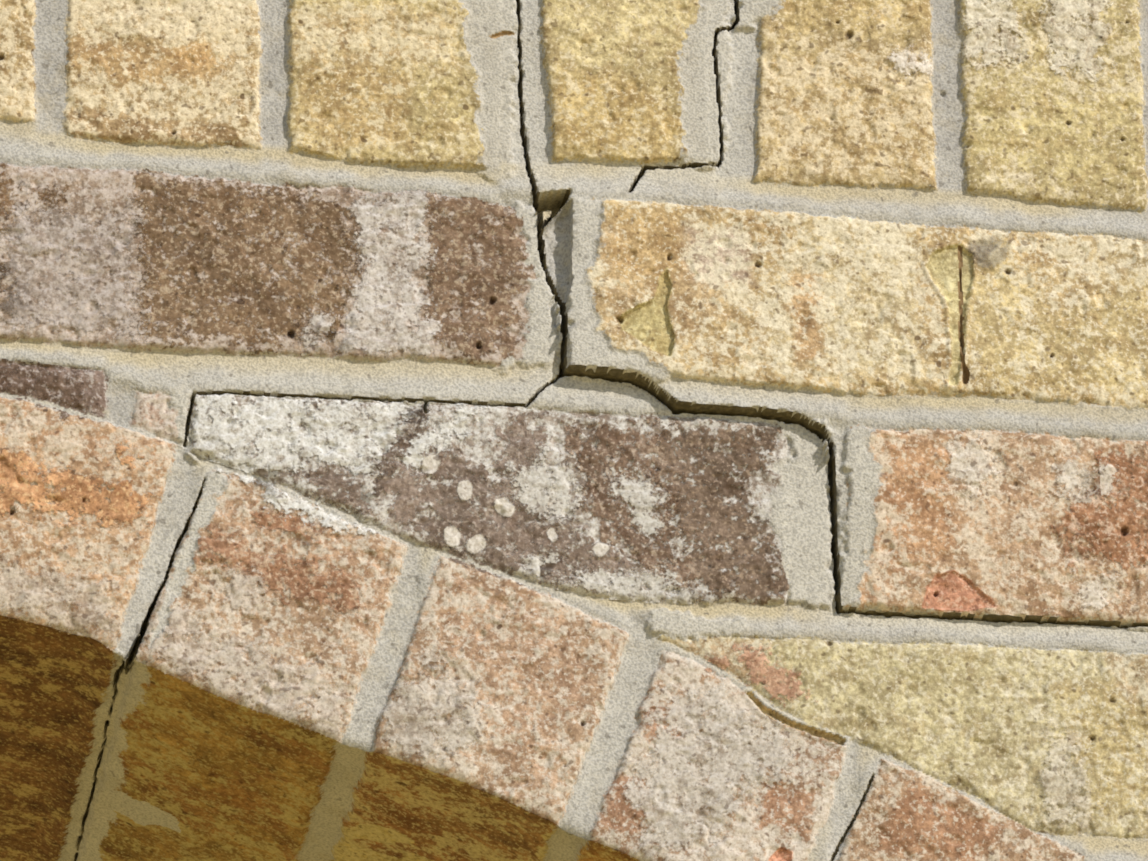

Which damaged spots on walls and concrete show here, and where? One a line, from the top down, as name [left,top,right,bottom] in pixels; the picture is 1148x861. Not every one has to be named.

crack [183,0,1148,628]
crack [74,480,204,861]
crack [831,776,874,861]